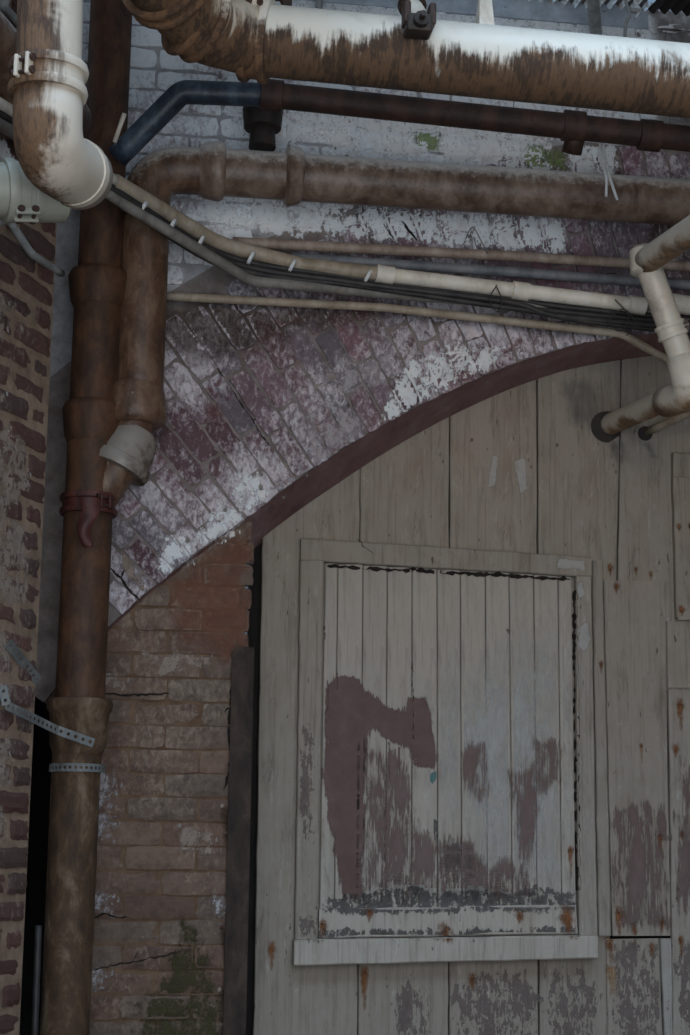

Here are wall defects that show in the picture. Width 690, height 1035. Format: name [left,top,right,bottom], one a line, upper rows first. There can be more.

peeling [158,466,308,573]
peeling [305,339,526,462]
peeling [299,673,580,943]
peeling [451,758,690,1035]